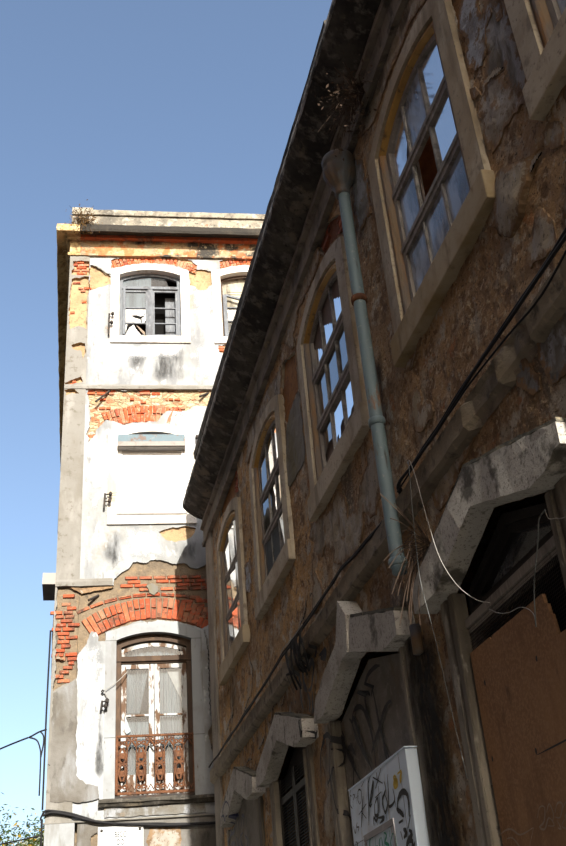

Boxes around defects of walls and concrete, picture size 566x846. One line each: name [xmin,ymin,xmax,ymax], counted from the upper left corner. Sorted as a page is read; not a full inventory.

peeling [357,0,427,139]
peeling [450,0,527,154]
spalling [68,258,251,329]
spalling [72,342,86,357]
spalling [65,377,211,442]
spalling [159,526,196,542]
spalling [49,559,208,803]